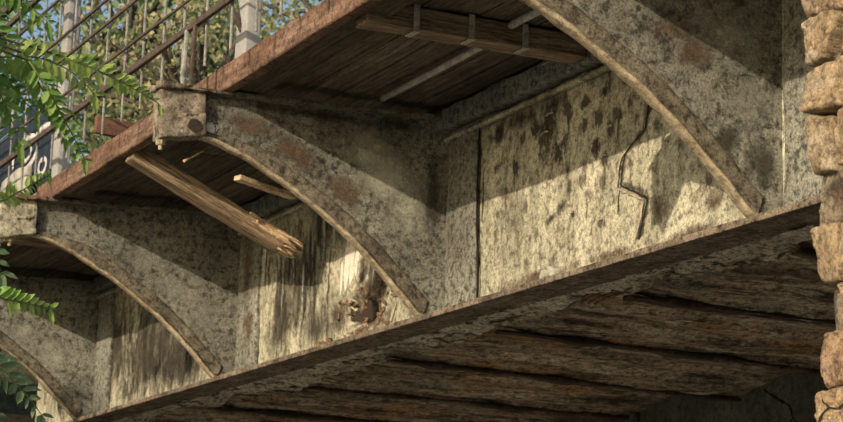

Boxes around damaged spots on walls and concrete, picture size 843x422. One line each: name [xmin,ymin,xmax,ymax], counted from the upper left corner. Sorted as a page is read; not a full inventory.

leakage [490,107,534,143]
leakage [547,165,570,223]
crack [617,100,651,241]
leakage [262,214,341,346]
leakage [340,243,374,295]
rust [355,257,386,304]
leakage [111,303,197,387]
crack [818,399,843,422]